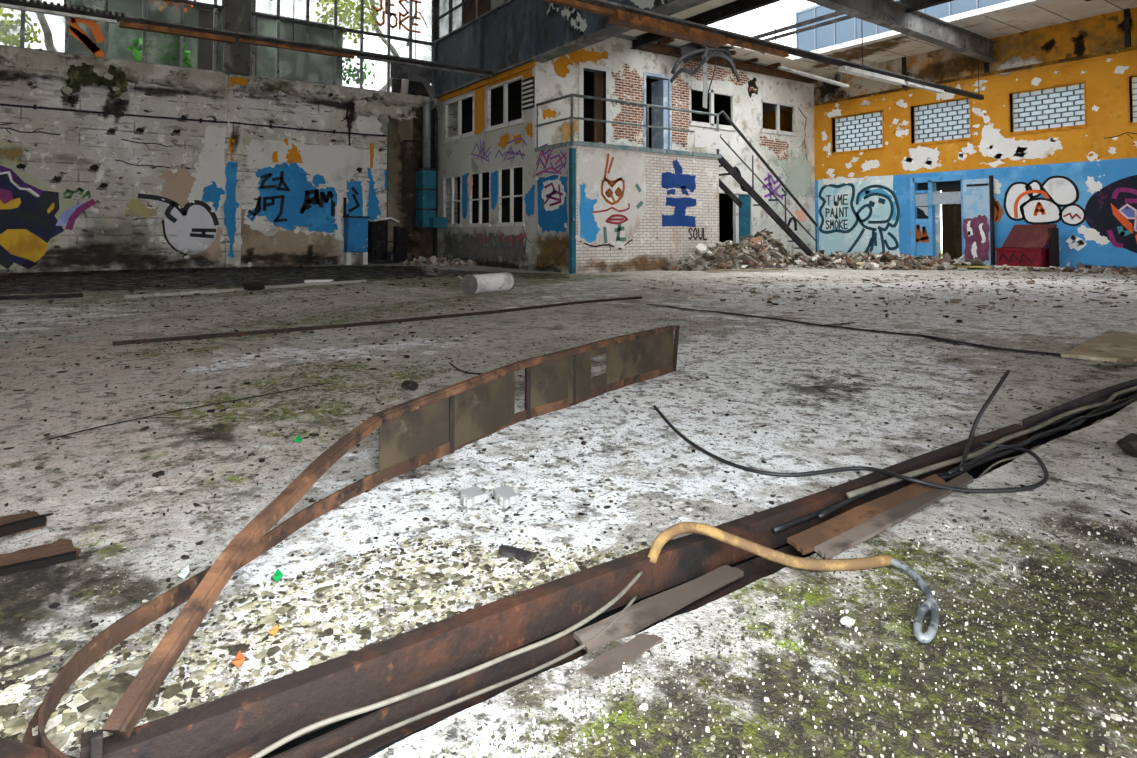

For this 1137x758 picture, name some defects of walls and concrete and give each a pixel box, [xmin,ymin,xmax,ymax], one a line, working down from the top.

peeling [620,0,669,9]
water stain [61,95,78,108]
spalling [672,60,758,148]
peeling [824,103,843,118]
spalling [524,3,647,249]
spalling [757,135,791,161]
peeling [821,131,880,185]
peeling [861,80,1063,194]
peeling [1086,137,1118,162]
peeling [1085,176,1103,194]